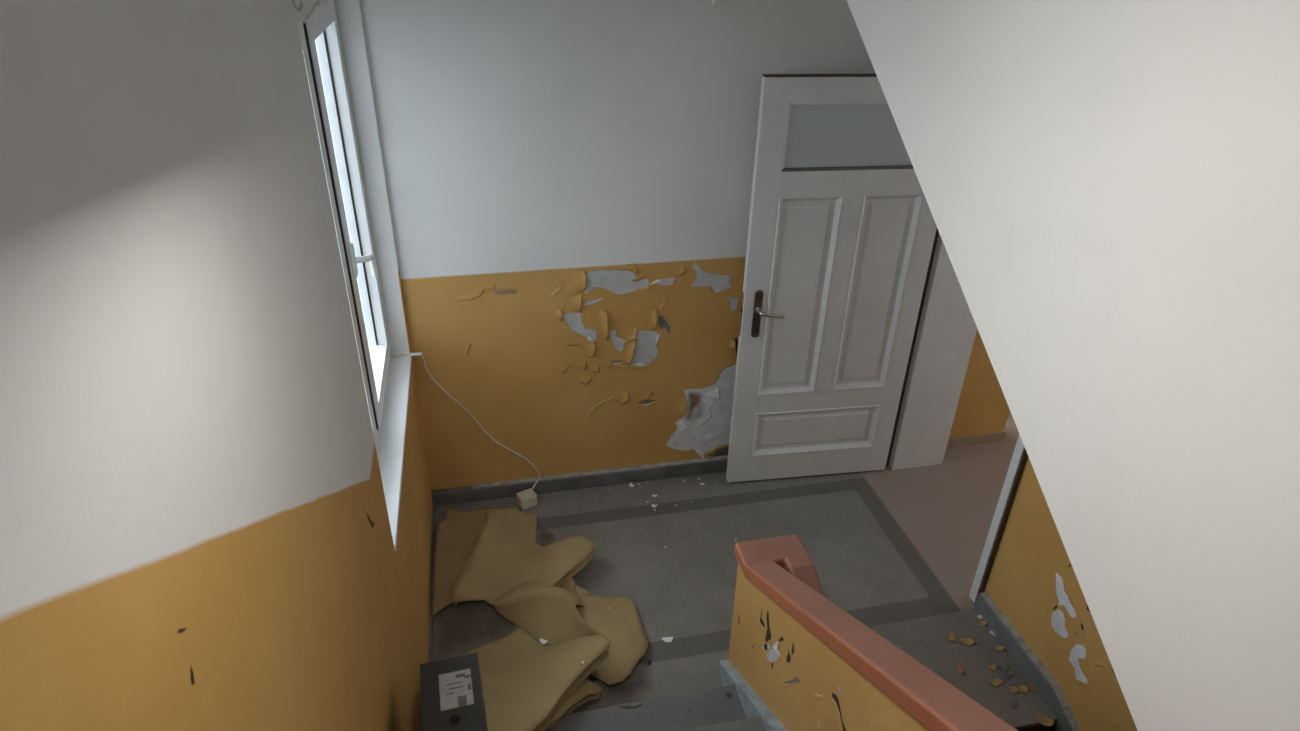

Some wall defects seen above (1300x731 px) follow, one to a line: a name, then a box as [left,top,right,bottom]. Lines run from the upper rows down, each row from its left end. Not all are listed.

peeling [550,261,740,371]
peeling [636,363,736,458]
peeling [762,641,780,664]
peeling [1051,572,1091,689]